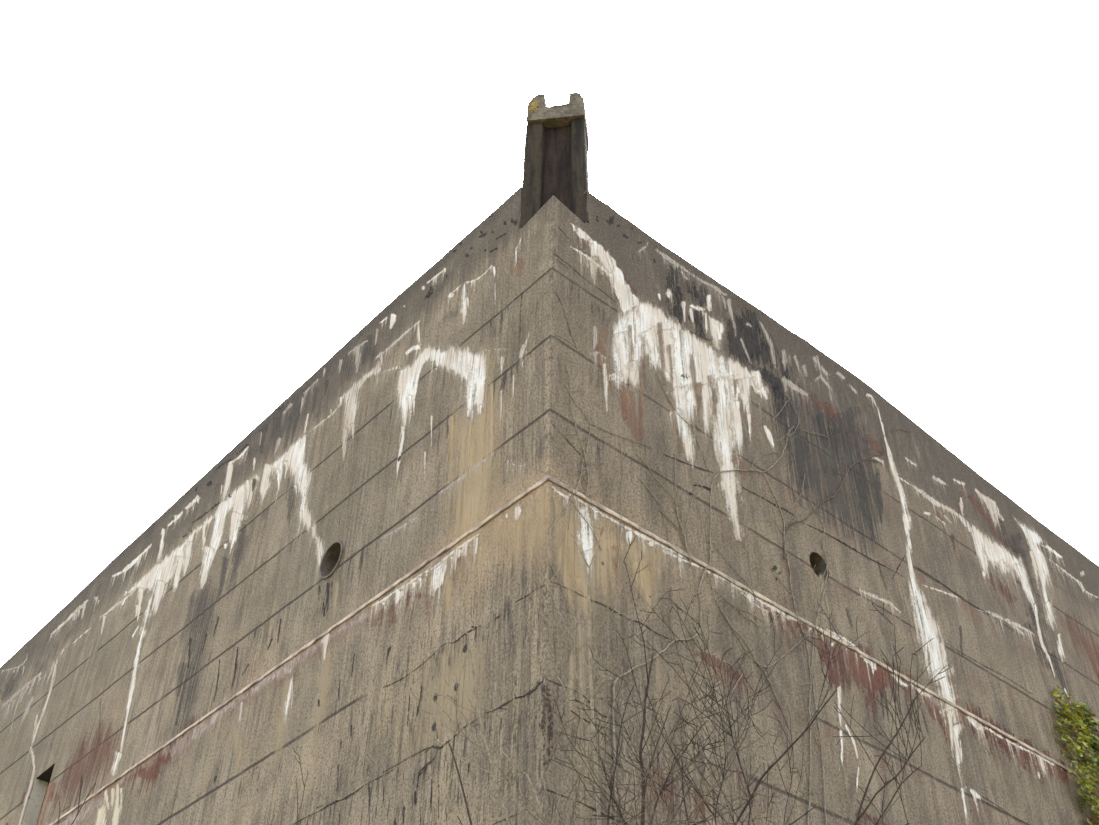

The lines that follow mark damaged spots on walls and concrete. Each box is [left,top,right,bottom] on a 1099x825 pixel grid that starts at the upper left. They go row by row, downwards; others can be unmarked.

damp [1,223,1097,825]